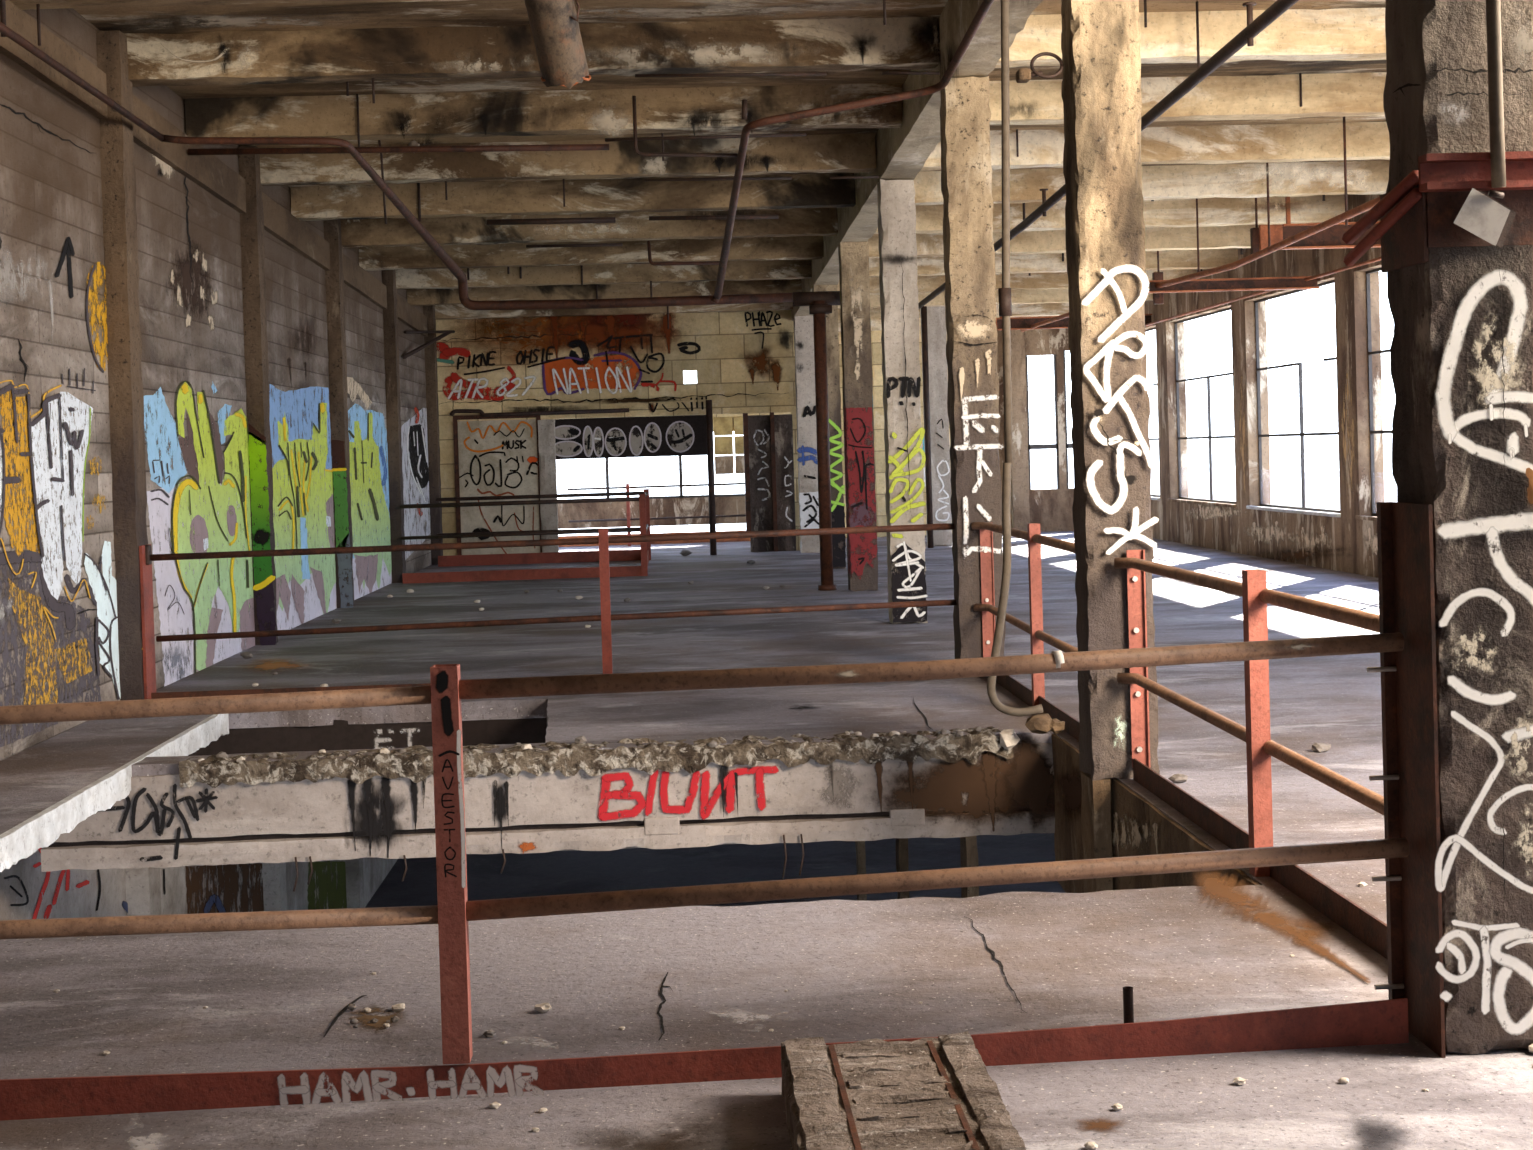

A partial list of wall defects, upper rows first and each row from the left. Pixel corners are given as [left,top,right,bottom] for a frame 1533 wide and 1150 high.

water stain [689,45,764,63]
water stain [596,111,626,134]
water stain [645,158,665,173]
corrosion [458,313,675,363]
corrosion [745,348,782,390]
spalling [179,745,433,789]
spalling [463,726,1013,808]
corrosion [875,736,1082,832]
crack [964,916,1027,1013]
crack [657,972,672,1041]